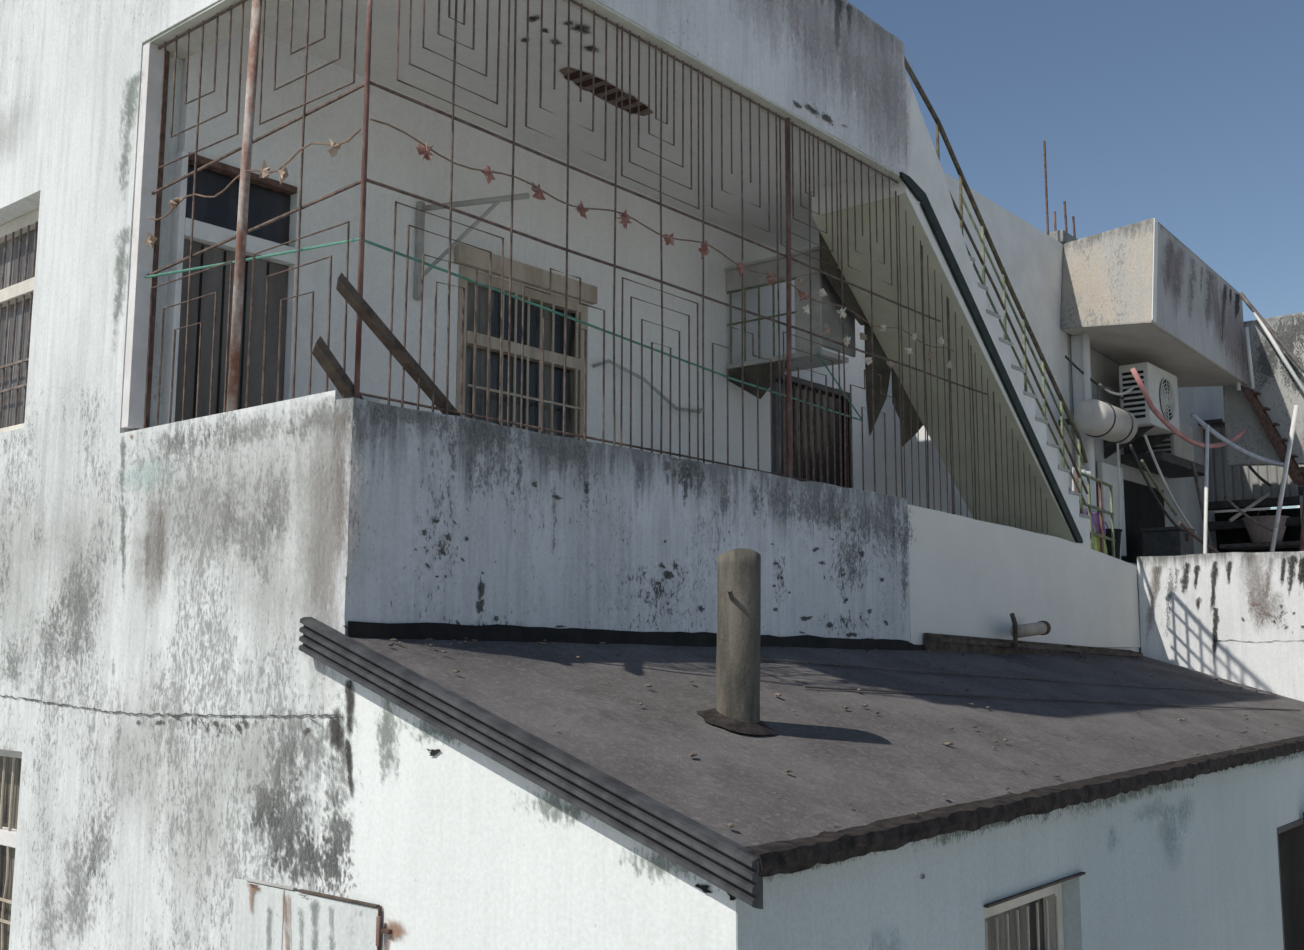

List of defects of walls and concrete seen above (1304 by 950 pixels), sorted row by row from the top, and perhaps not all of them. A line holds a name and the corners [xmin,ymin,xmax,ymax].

water stain [564,22,598,52]
water stain [805,0,898,121]
water stain [119,72,141,189]
water stain [113,229,132,332]
water stain [1166,240,1304,398]
water stain [0,544,105,698]
water stain [119,397,612,607]
water stain [665,458,706,507]
water stain [750,486,913,604]
water stain [1149,561,1232,660]
water stain [1249,555,1304,617]
crack [0,695,341,742]